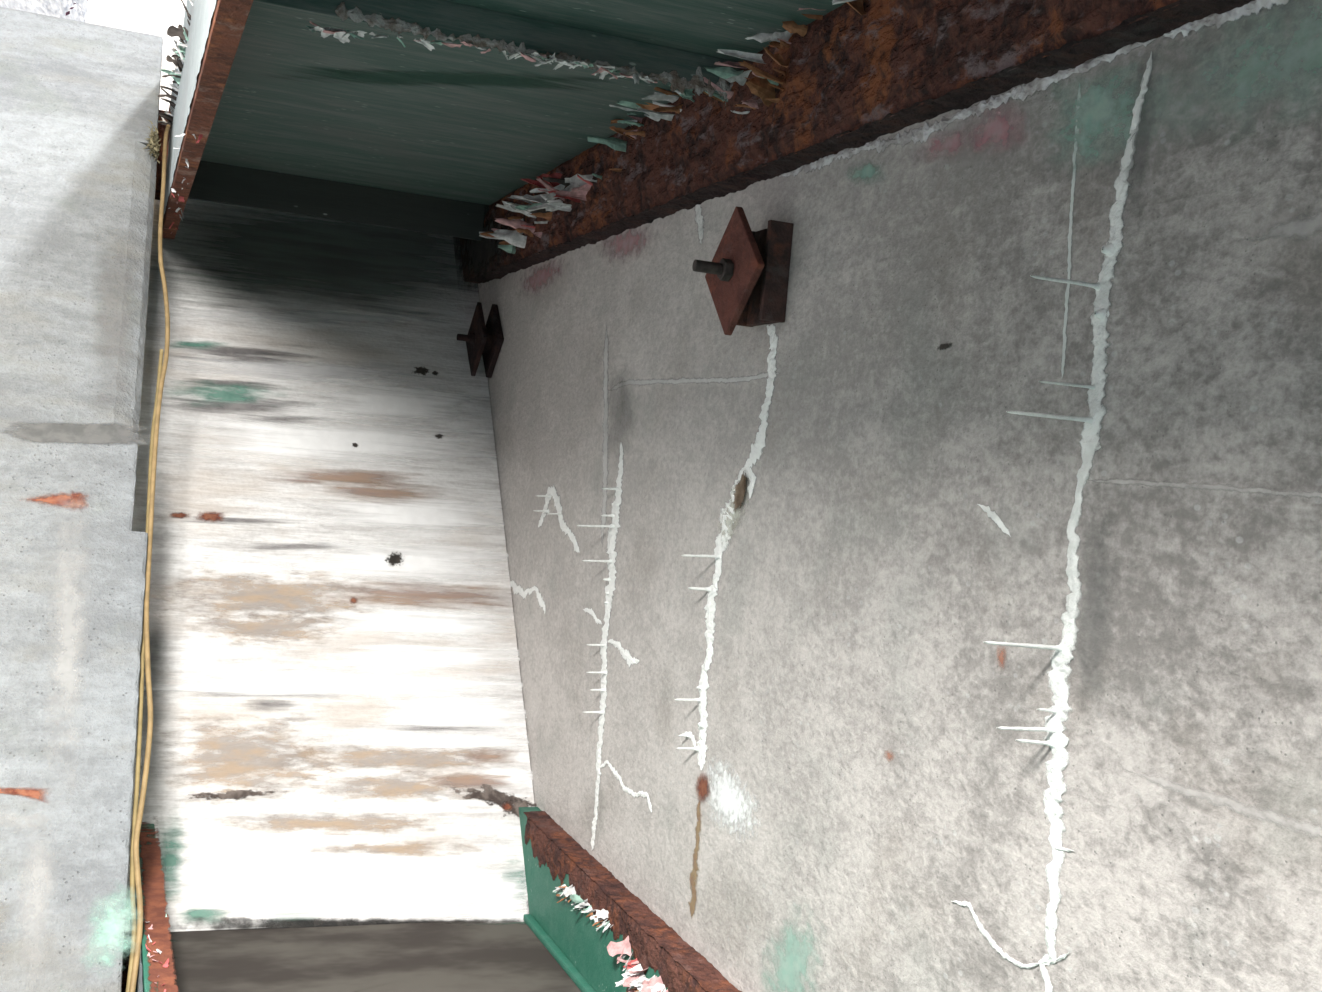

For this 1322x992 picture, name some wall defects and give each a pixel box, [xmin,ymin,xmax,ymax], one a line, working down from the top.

corrosion [162,0,253,238]
peeling [305,0,866,152]
corrosion [467,0,1255,283]
spalling [779,0,1289,177]
water stain [188,347,476,460]
water stain [211,543,505,578]
water stain [329,497,490,529]
crack [533,442,652,850]
crack [674,324,778,770]
crack [951,51,1152,992]
peeling [552,882,668,992]
corrosion [523,811,742,992]